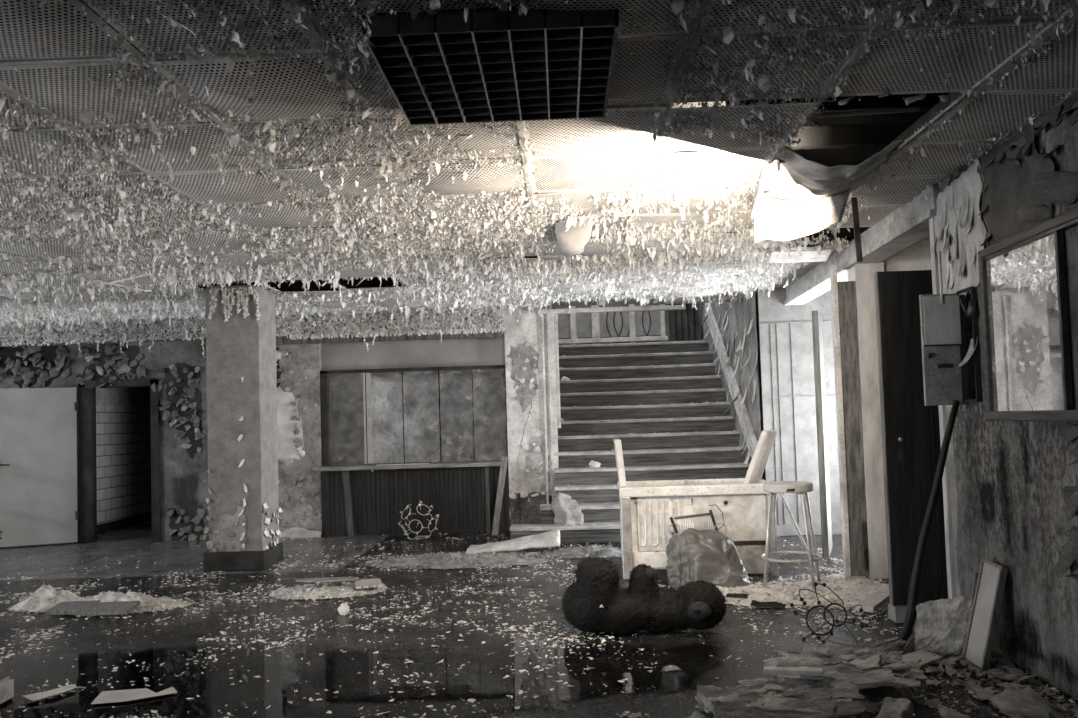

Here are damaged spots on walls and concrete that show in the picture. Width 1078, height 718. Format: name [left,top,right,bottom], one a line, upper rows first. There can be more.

peeling [0,0,1078,471]
peeling [743,540,860,587]
peeling [1052,486,1078,604]
peeling [699,597,903,666]